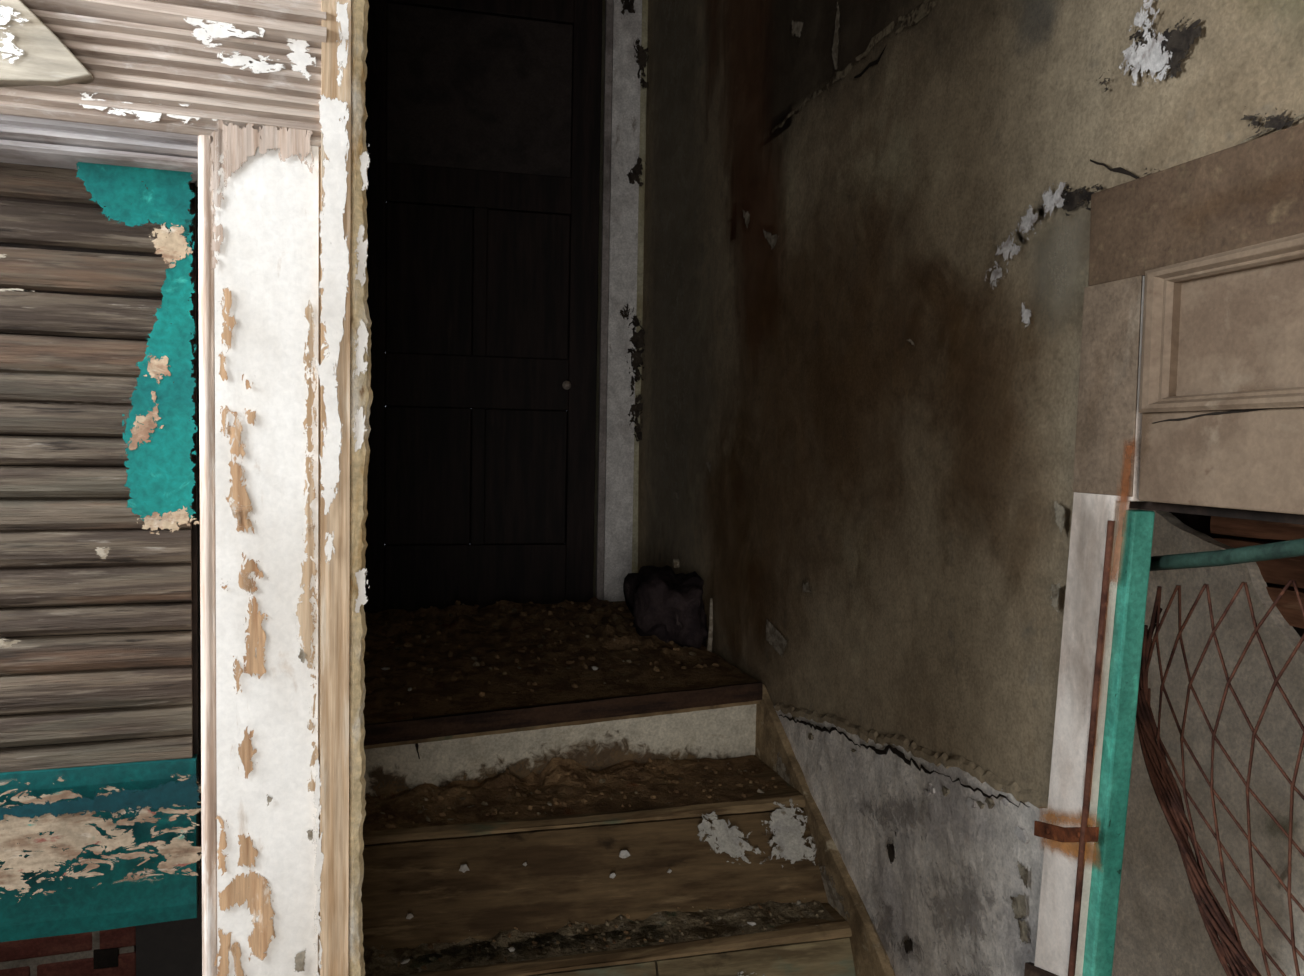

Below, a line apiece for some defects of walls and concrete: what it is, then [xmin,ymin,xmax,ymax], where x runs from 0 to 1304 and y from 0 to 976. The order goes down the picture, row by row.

peeling [621,0,636,15]
peeling [634,38,651,88]
peeling [1096,0,1201,92]
spalling [1241,108,1299,135]
peeling [627,156,646,186]
peeling [984,182,1103,305]
peeling [1020,302,1032,327]
peeling [620,303,645,442]
spalling [208,0,373,976]
spalling [1210,516,1304,548]
spalling [1256,556,1304,629]
crack [779,714,1028,808]